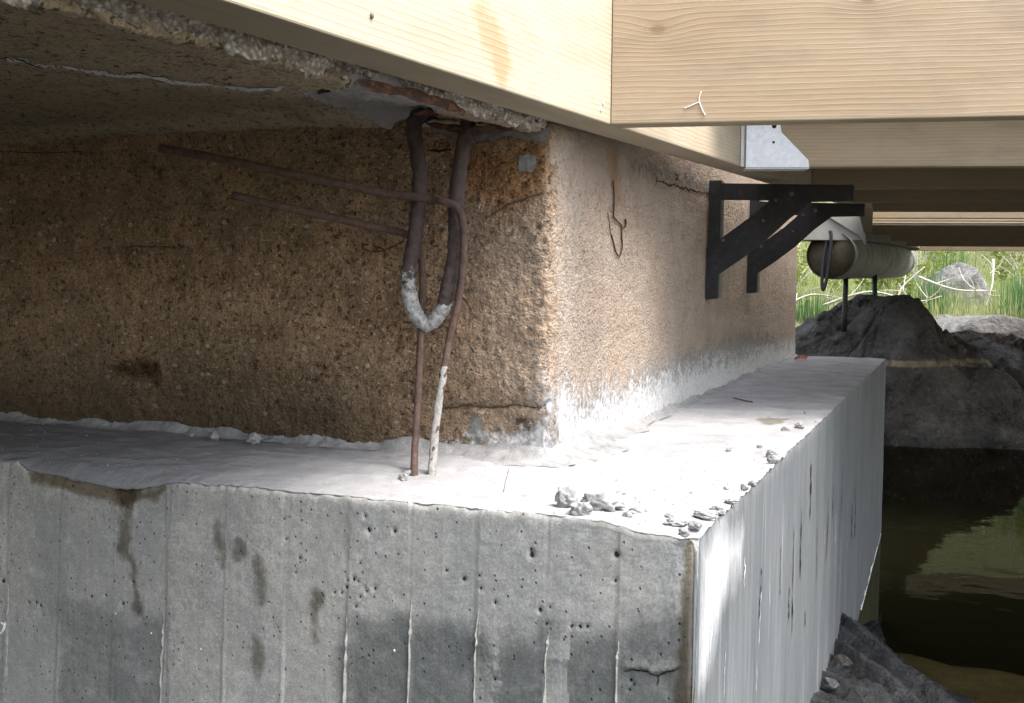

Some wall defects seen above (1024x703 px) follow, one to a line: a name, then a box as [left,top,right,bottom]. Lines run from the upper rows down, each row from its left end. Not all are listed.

crack [0,56,285,92]
corrosion [357,78,514,133]
crack [656,174,709,195]
spalling [158,72,476,476]
crack [445,402,543,410]
crack [624,664,679,684]